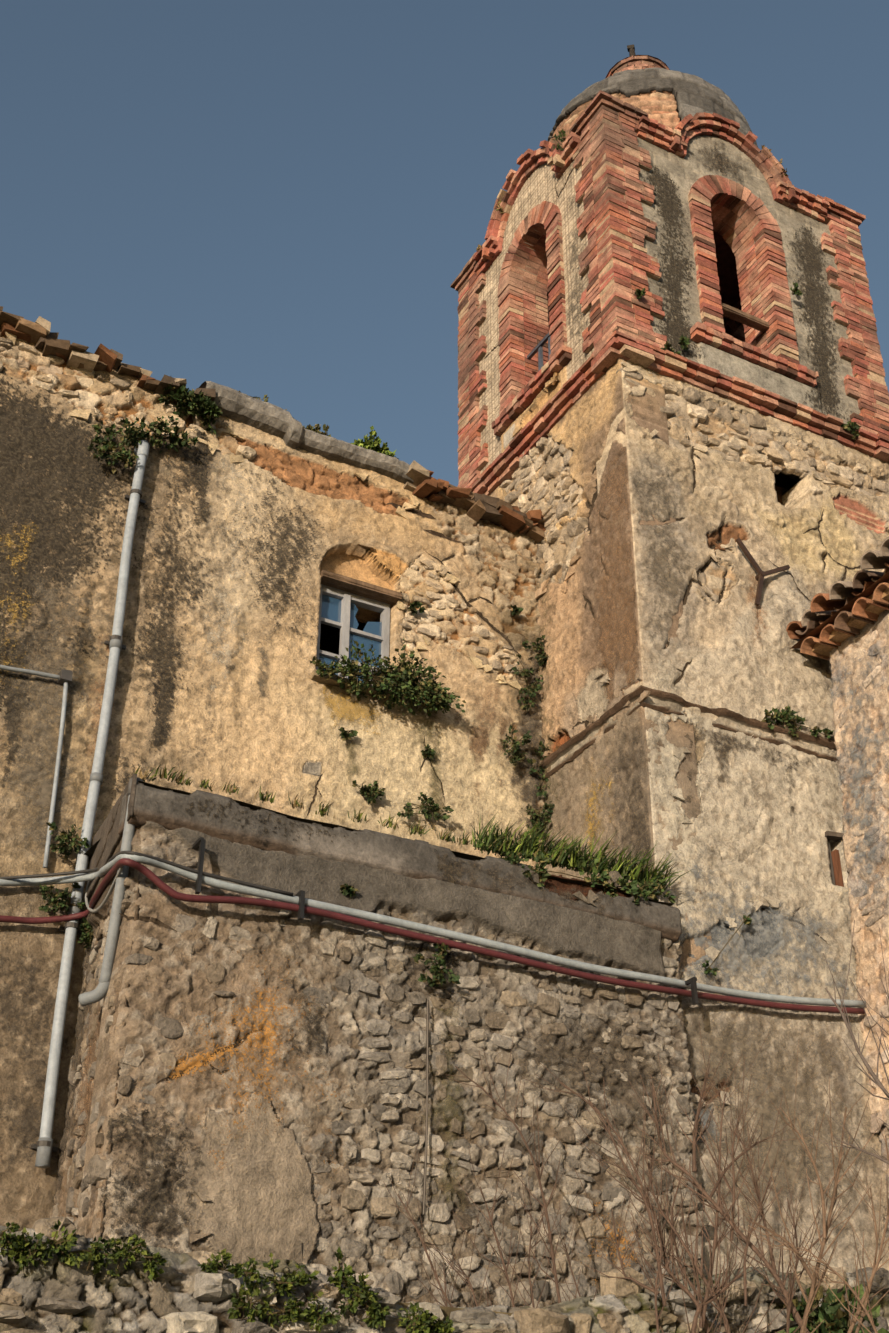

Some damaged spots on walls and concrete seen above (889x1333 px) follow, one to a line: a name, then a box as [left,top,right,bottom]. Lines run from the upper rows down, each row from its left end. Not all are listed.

spalling [0,306,590,599]
crack [662,433,701,525]
leakage [192,427,255,690]
crack [680,516,727,605]
crack [769,509,860,601]
leakage [0,580,109,856]
leakage [149,671,176,746]
leakage [257,635,269,697]
spalling [357,544,522,690]
crack [664,638,692,685]